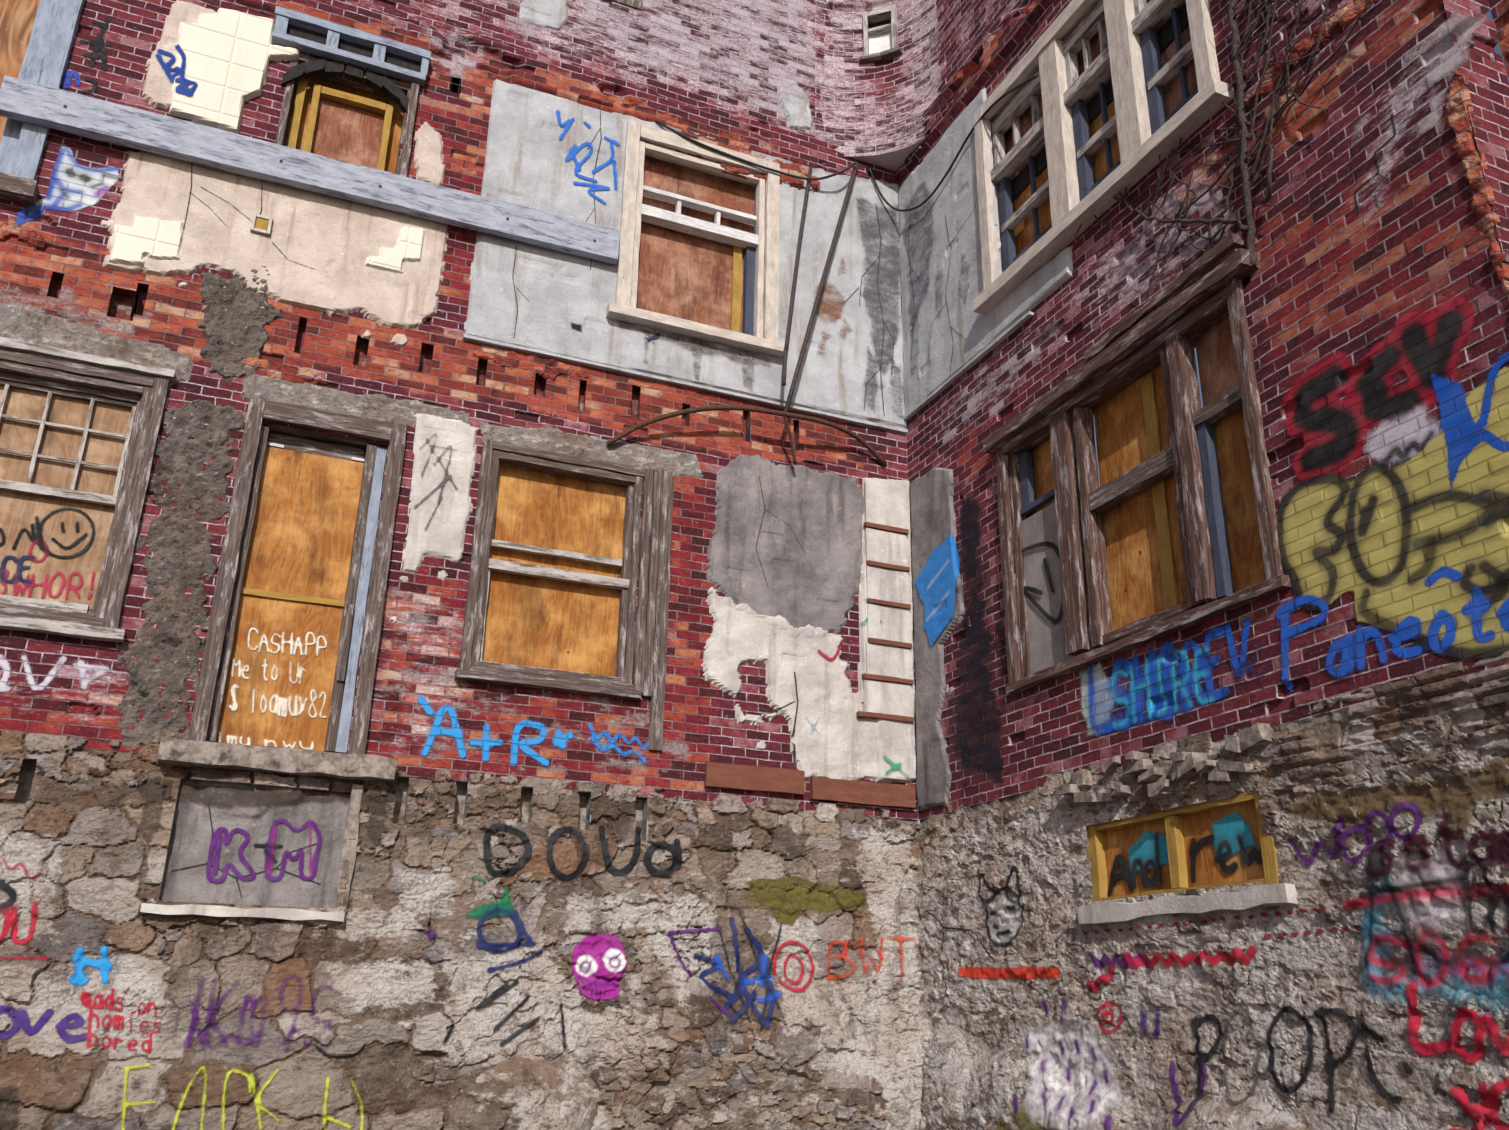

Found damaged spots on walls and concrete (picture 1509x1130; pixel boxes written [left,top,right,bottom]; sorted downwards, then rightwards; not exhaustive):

flaking render [142,0,217,109]
flaking render [101,150,449,386]
flaking render [414,122,445,186]
water stain [857,182,939,418]
spalling [116,392,244,748]
flaking render [701,455,965,811]